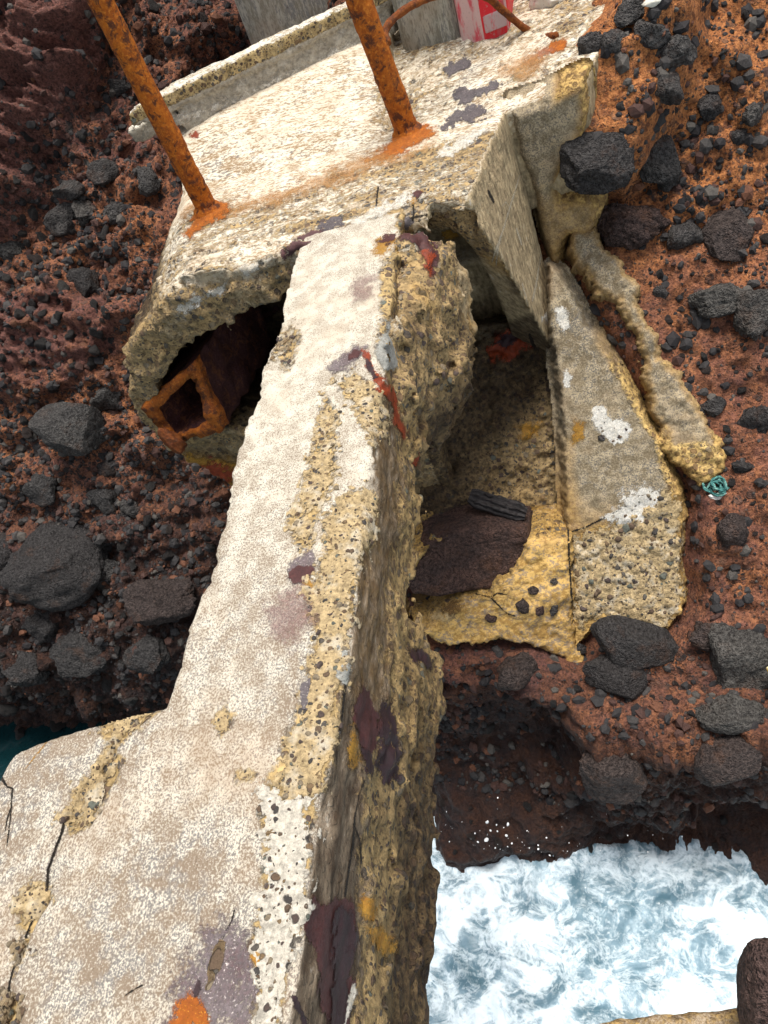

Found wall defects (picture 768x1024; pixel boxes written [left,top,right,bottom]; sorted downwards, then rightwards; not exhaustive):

spalling [267,317,302,370]
corrosion [325,343,408,439]
crack [474,593,515,616]
crack [567,506,627,611]
spalling [571,487,687,631]
crack [45,776,92,890]
crack [4,920,34,1014]
corrosion [161,911,259,1024]